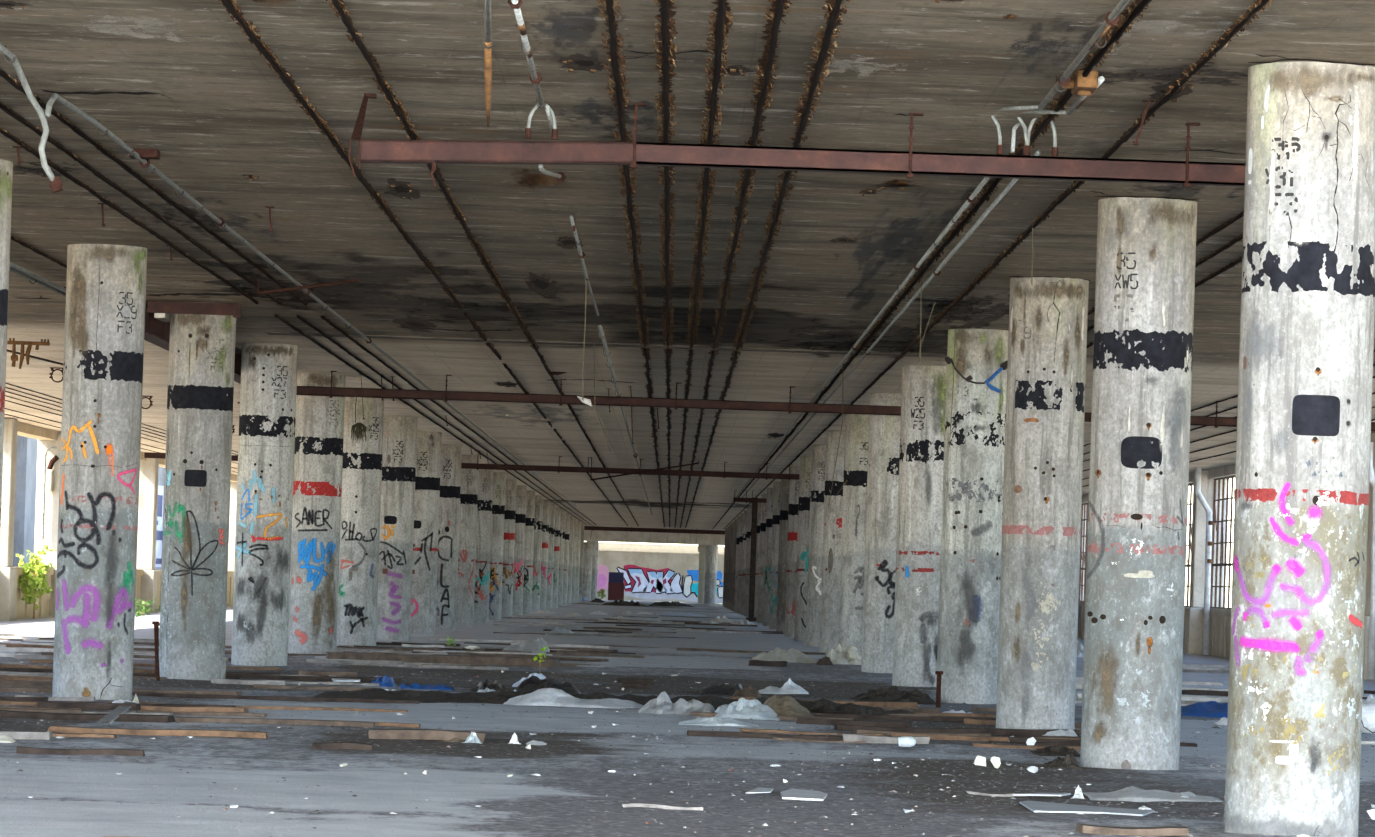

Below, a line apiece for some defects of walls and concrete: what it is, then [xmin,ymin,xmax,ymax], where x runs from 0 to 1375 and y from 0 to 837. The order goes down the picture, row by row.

rust [218,0,355,163]
water stain [527,6,602,58]
rust [596,0,630,107]
rust [652,0,677,77]
rust [700,11,733,145]
rust [789,0,850,142]
water stain [0,162,77,198]
crack [1248,54,1375,253]
water stain [173,314,229,385]
water stain [194,190,1085,387]
rust [618,165,767,356]
water stain [313,554,335,646]